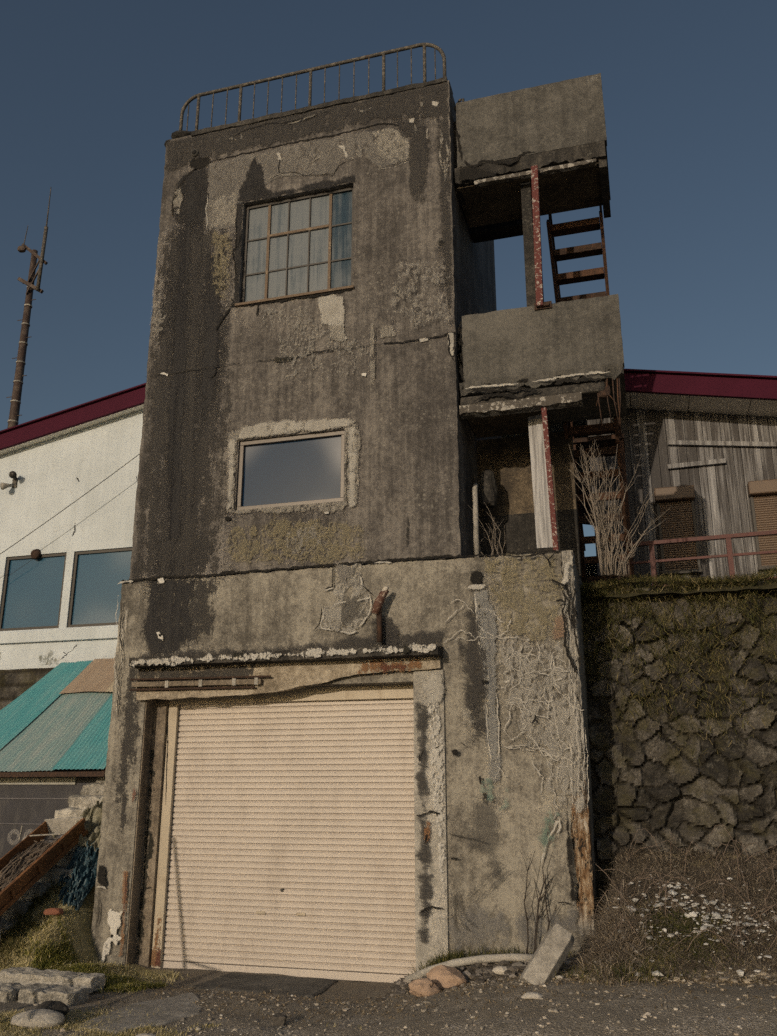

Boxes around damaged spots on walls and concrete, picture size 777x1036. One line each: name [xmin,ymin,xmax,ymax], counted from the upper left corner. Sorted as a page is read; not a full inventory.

leakage [165,82,452,313]
peeling [113,595,436,715]
leakage [114,202,444,834]
spalling [314,563,374,635]
leakage [458,590,509,810]
leakage [136,749,155,956]